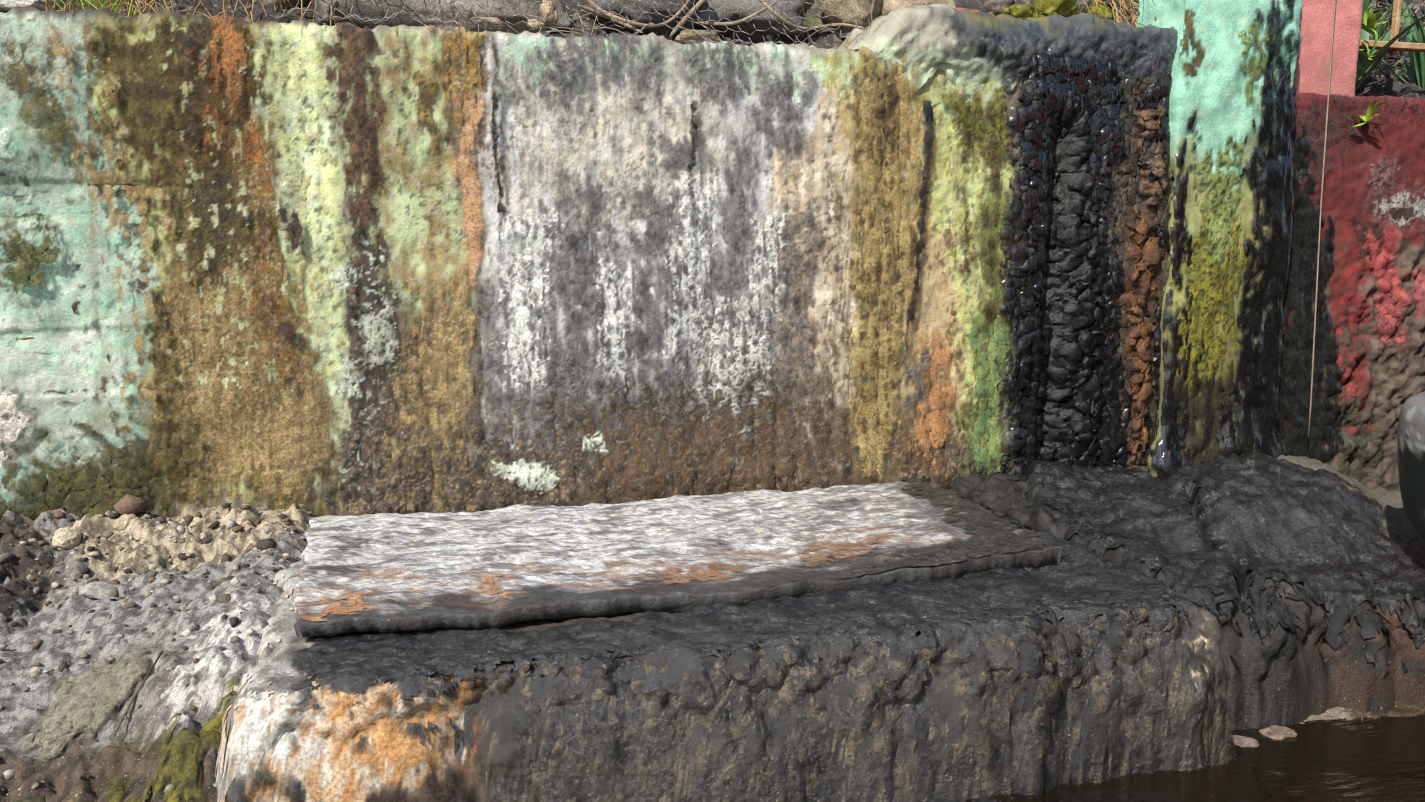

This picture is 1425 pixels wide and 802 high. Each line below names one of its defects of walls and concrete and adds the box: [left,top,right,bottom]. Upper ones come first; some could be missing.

rust [198,15,264,163]
rust [451,96,485,287]
water stain [18,15,1035,518]
water stain [1036,9,1258,479]
peeling [0,379,33,467]
rust [302,588,377,621]
rust [474,573,512,602]
rust [660,562,750,584]
rust [796,535,883,564]